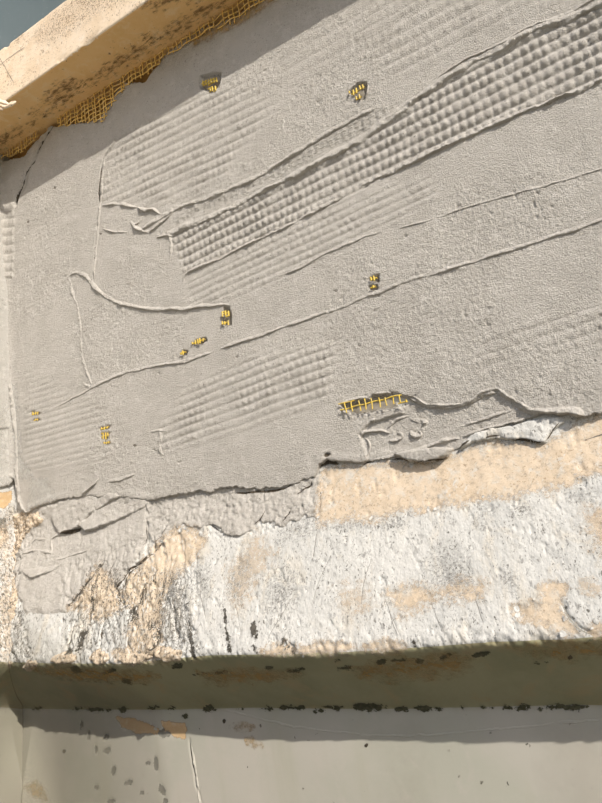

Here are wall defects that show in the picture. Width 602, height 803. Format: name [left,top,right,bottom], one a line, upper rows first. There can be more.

peeling [315,391,602,529]
spalling [0,511,43,669]
peeling [66,525,207,675]
peeling [386,579,485,620]
peeling [509,580,578,639]
spalling [50,651,83,673]
peeling [259,638,352,671]
peeling [363,638,424,665]